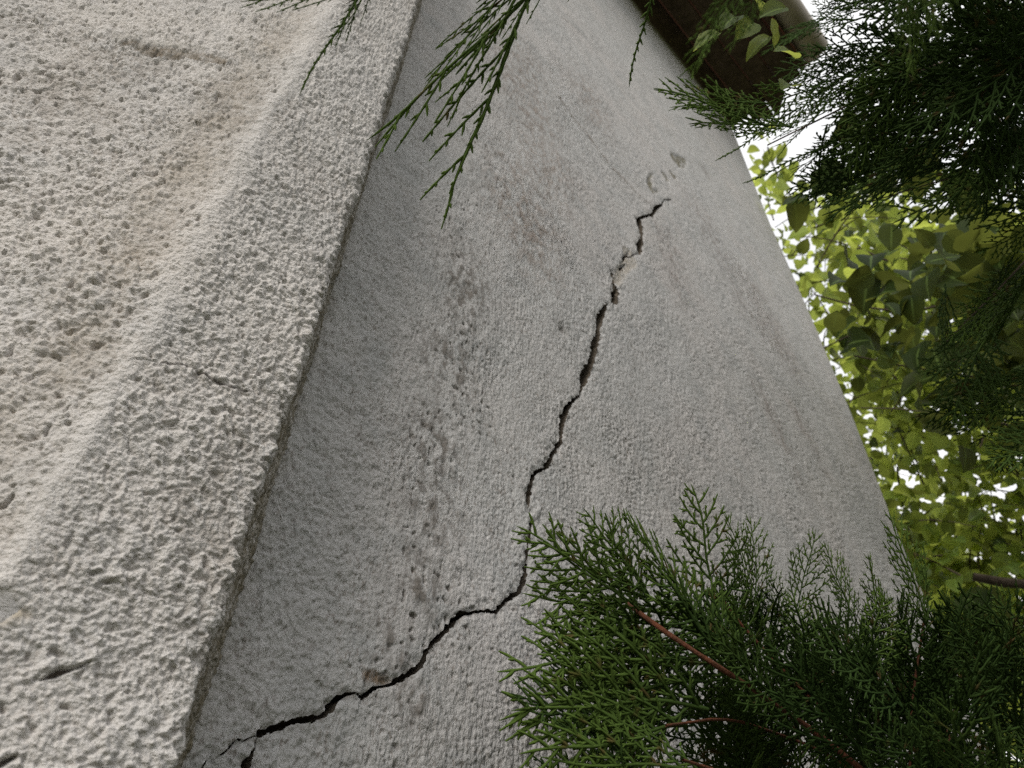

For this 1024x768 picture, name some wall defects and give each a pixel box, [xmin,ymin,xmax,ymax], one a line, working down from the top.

crack [201,199,670,768]